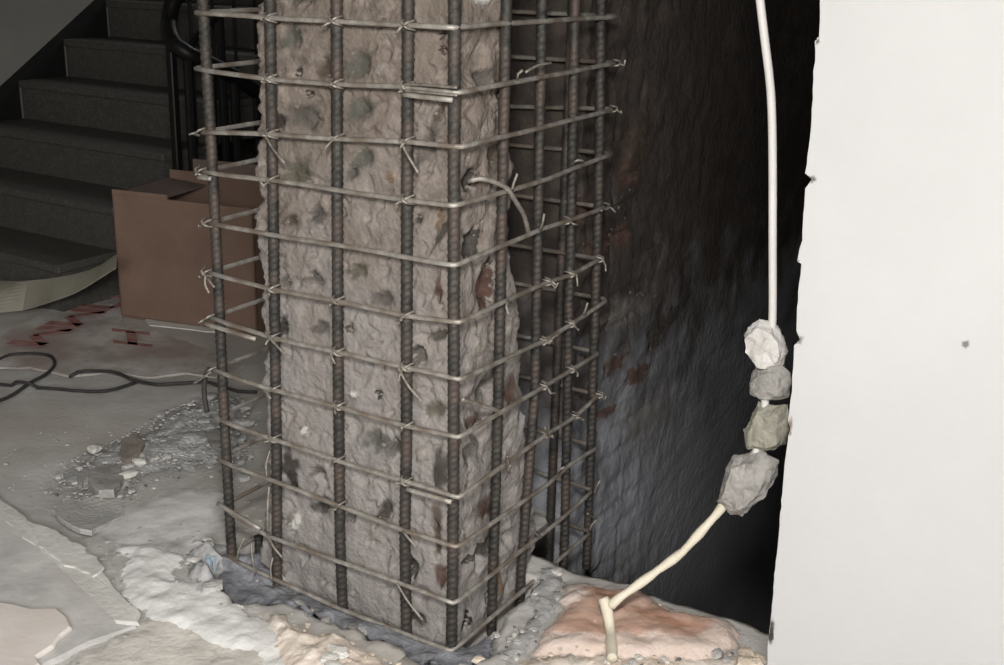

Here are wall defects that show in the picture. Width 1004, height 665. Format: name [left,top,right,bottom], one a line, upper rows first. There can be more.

spalling [415,102,446,166]
spalling [460,166,479,214]
spalling [430,221,448,254]
spalling [461,227,495,315]
spalling [280,317,289,336]
spalling [412,346,427,366]
spalling [364,431,401,456]
spalling [311,497,329,515]
spalling [377,497,393,521]
spalling [289,511,305,533]
spalling [474,537,489,556]
spalling [411,555,419,579]